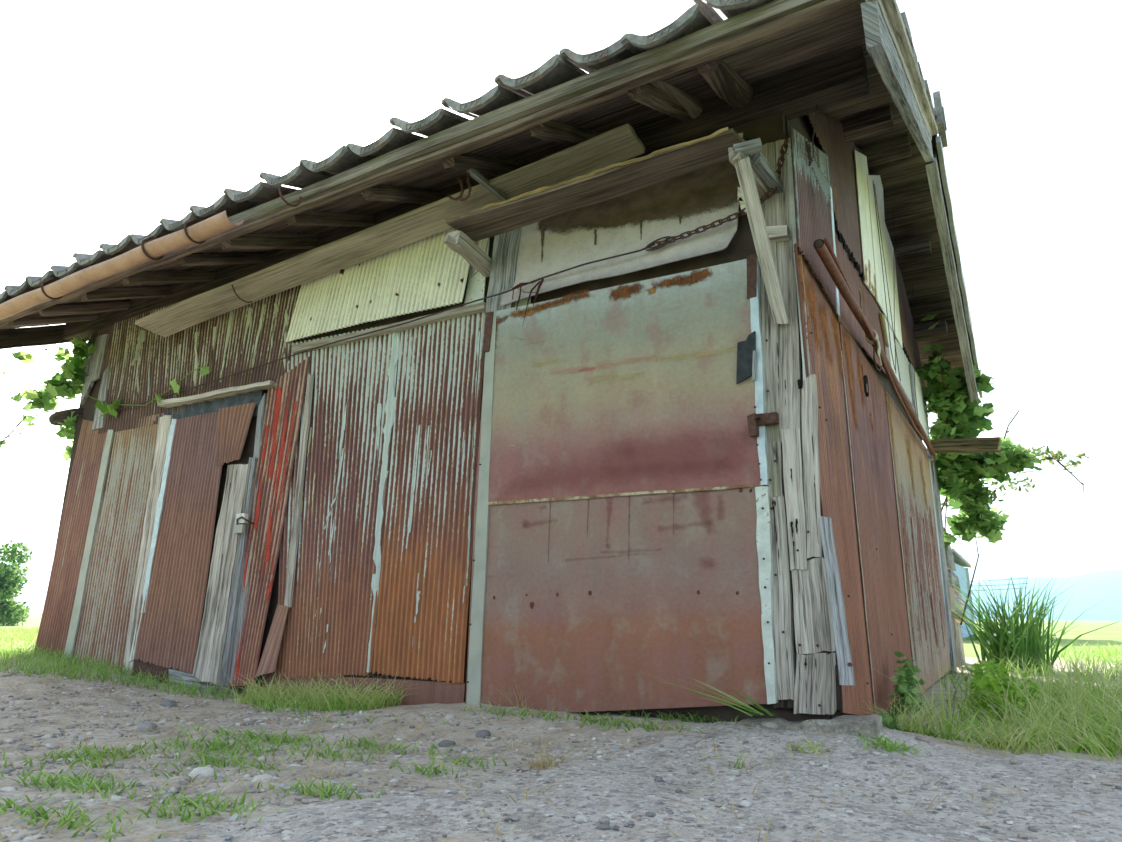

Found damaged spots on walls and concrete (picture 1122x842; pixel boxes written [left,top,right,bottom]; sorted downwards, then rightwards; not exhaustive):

corrosion [495,290,590,339]
corrosion [609,268,712,301]
corrosion [798,253,874,429]
peeling [310,403,347,653]
peeling [367,332,400,672]
peeling [406,425,432,549]
peeling [463,516,471,602]